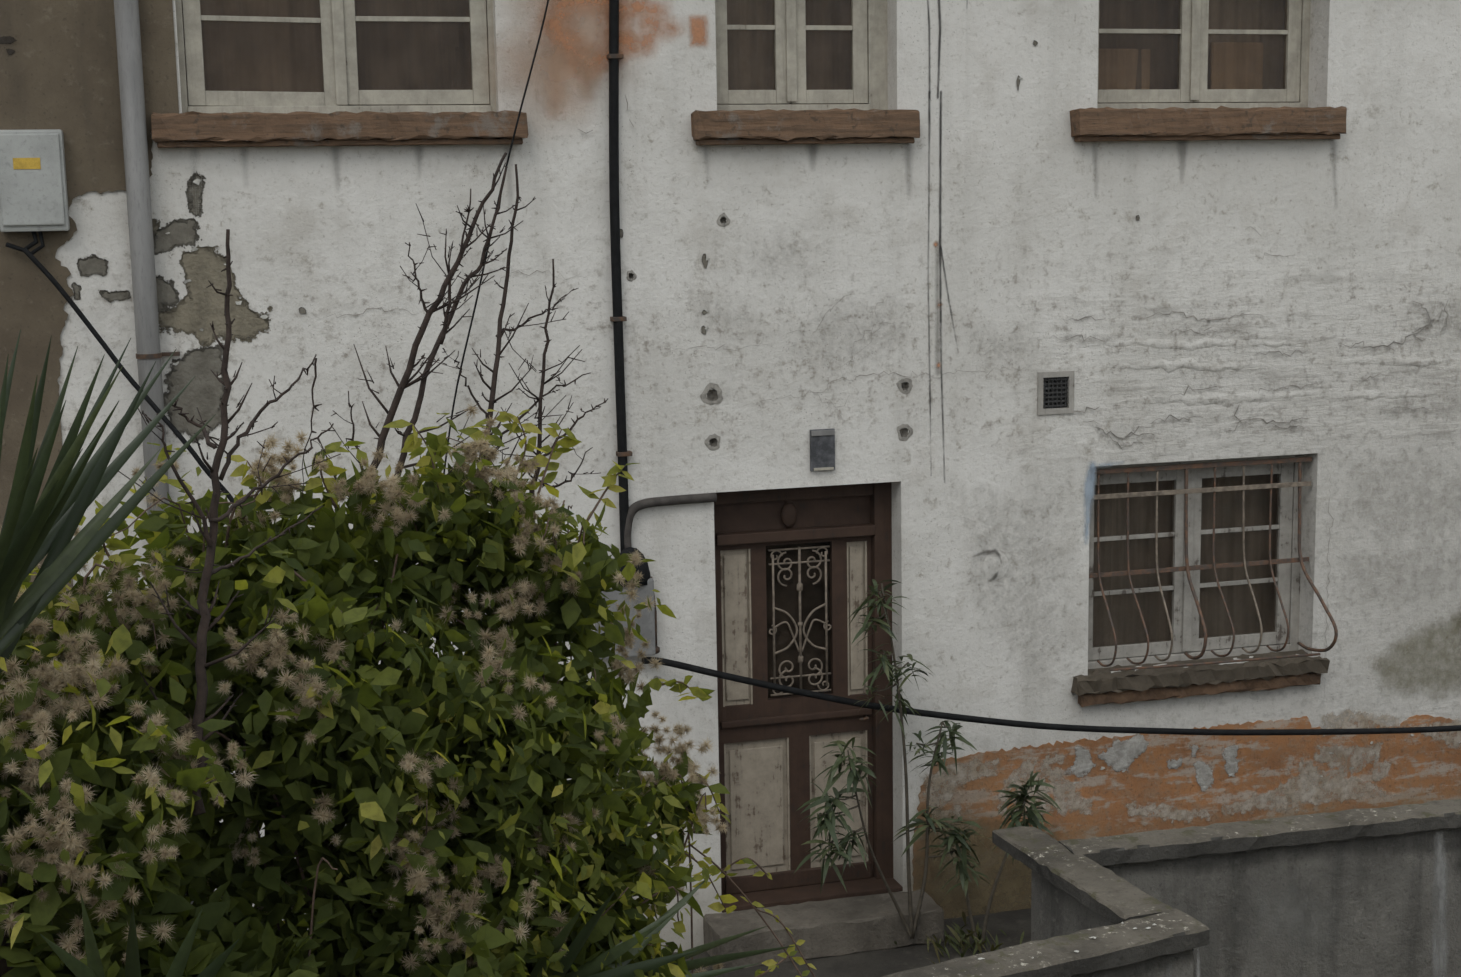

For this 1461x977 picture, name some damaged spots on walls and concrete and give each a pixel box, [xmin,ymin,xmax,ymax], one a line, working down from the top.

rust [528,0,706,84]
flaking render [71,254,131,303]
flaking render [152,171,273,443]
water stain [1380,619,1461,686]
peeling [923,734,1149,827]
peeling [1126,709,1461,823]